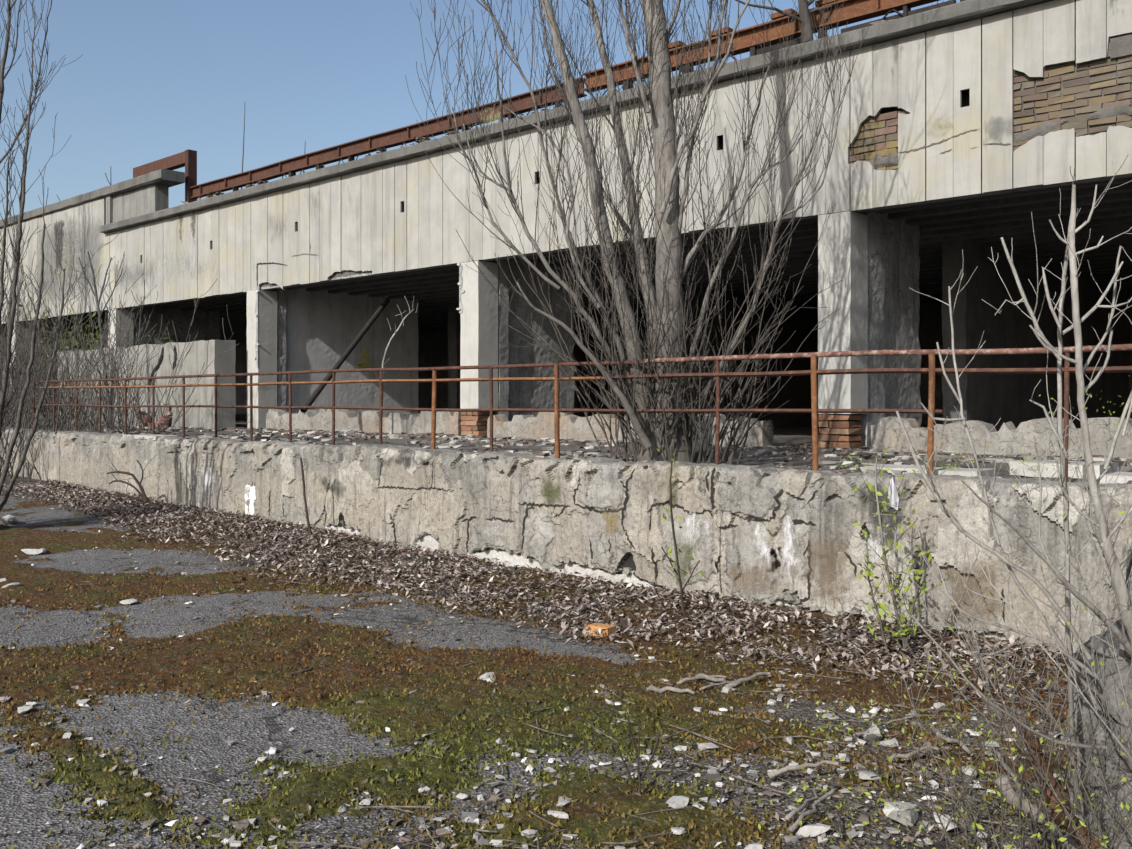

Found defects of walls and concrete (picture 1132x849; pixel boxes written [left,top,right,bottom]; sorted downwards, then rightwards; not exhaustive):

flaking render [1013,22,1132,152]
flaking render [849,110,910,170]
crack [376,460,453,541]
crack [461,468,824,606]
crack [844,551,857,576]